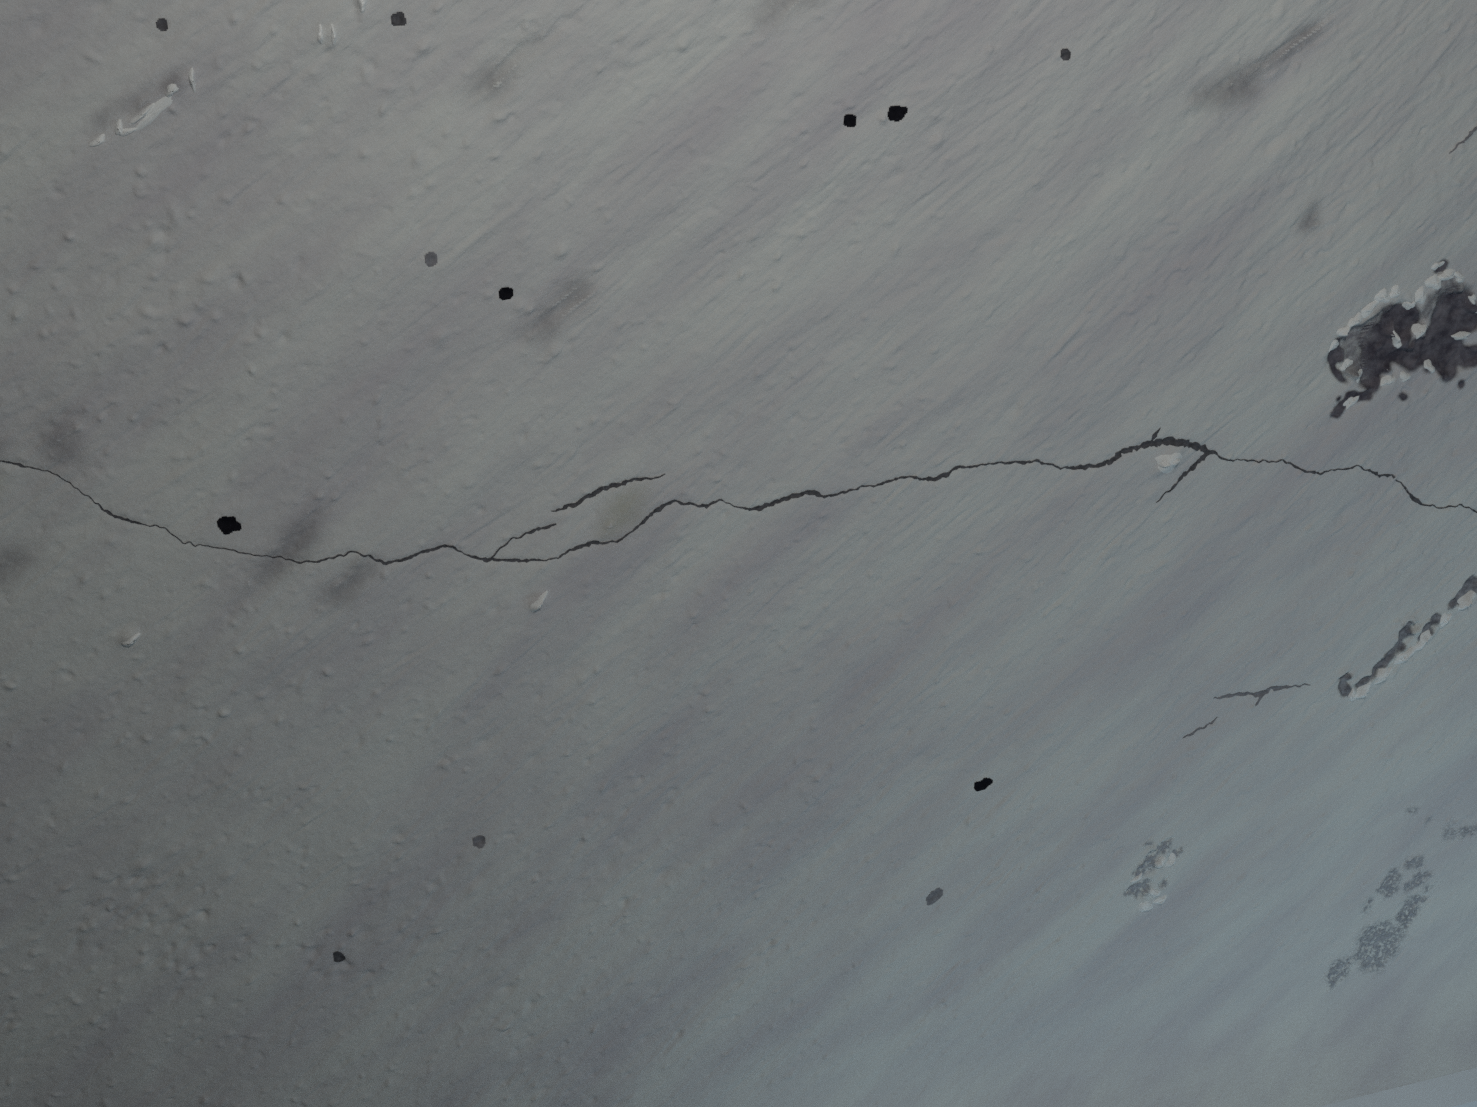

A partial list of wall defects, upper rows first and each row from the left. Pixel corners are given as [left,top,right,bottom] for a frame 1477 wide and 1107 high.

peeling [1328,260,1477,418]
crack [1,428,1477,565]
peeling [1338,576,1477,701]